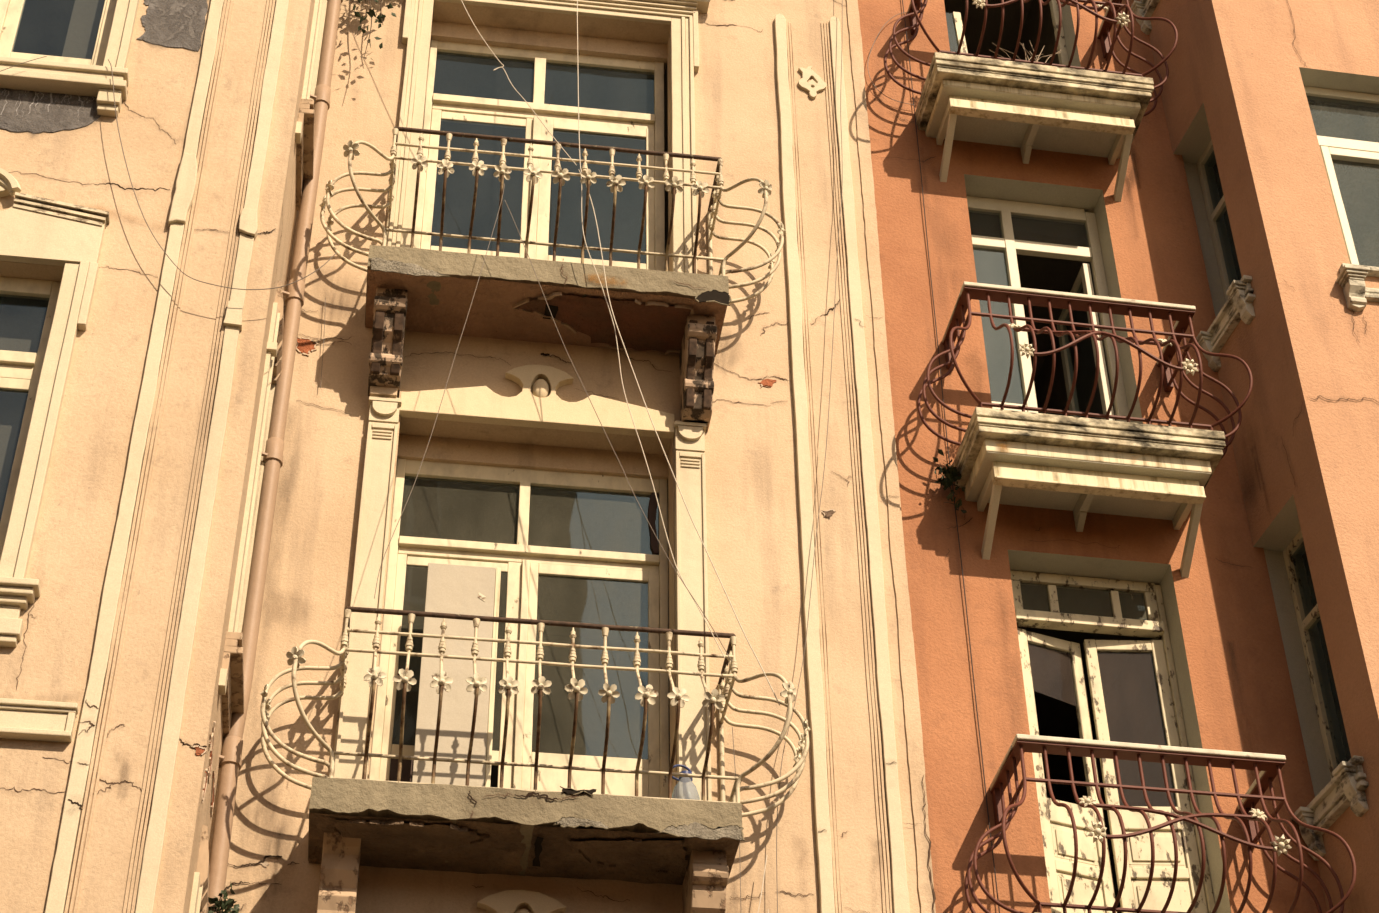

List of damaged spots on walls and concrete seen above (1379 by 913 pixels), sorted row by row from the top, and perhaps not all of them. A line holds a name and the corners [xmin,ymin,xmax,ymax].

crack [8,171,167,191]
peeling [512,289,732,355]
crack [1281,396,1379,484]
crack [2,699,146,810]
crack [226,855,299,910]